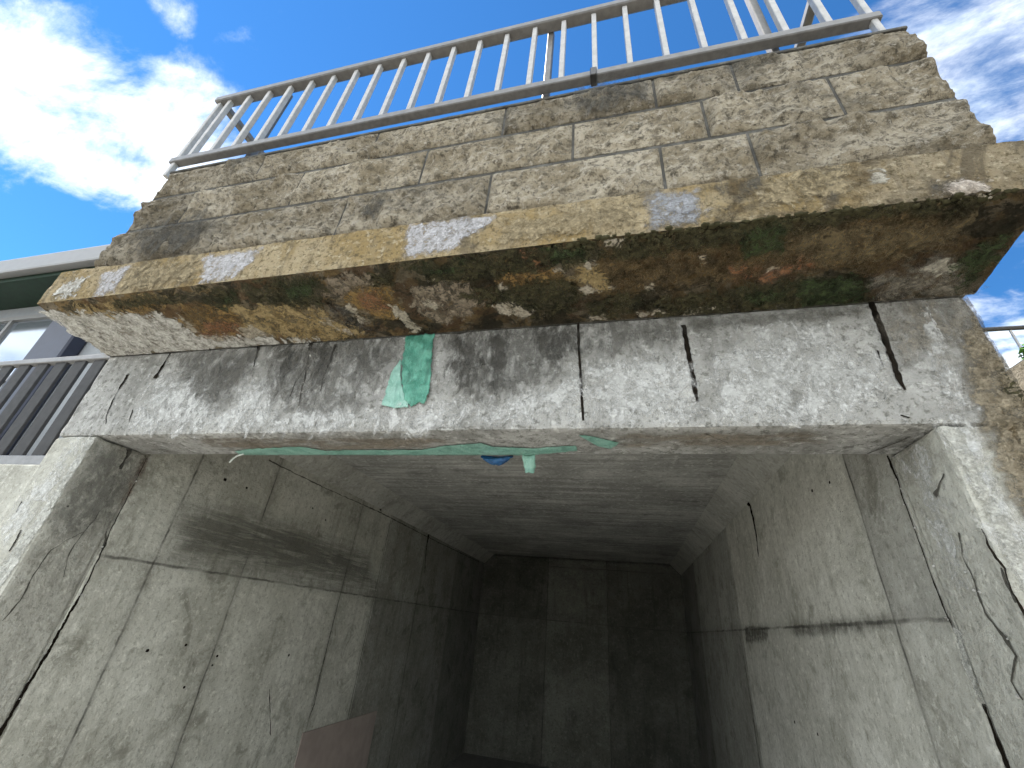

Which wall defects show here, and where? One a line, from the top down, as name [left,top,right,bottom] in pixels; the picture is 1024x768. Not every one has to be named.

peeling [35,271,373,357]
leakage [135,325,581,433]
crack [576,323,584,421]
crack [681,325,699,402]
crack [868,302,906,390]
crack [0,449,150,736]
leakage [189,515,370,580]
crack [867,415,958,638]
crack [958,529,1024,700]
crack [981,703,1010,768]